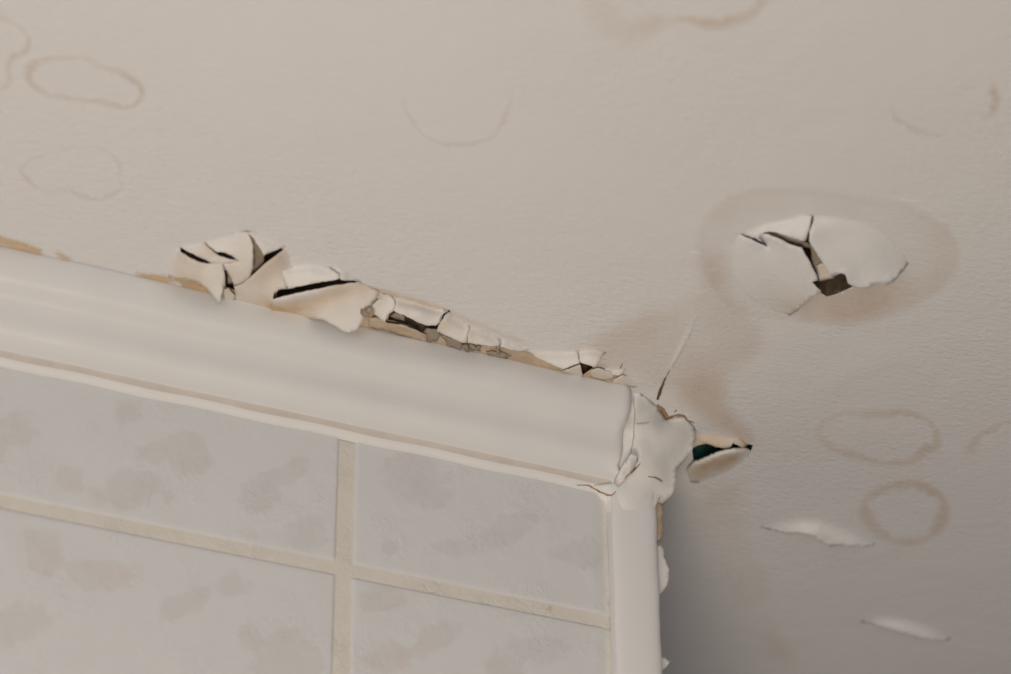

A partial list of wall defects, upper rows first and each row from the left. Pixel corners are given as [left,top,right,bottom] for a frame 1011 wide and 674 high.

peeling [168,231,637,388]
peeling [687,432,753,483]
peeling [760,517,875,547]
peeling [860,614,951,641]